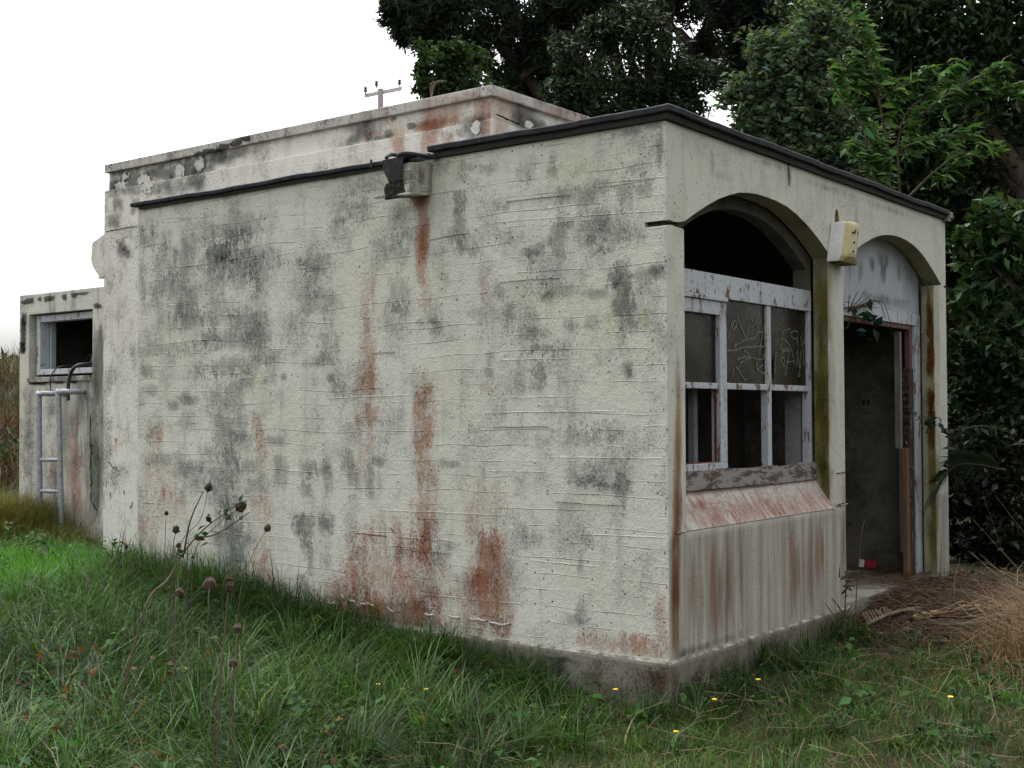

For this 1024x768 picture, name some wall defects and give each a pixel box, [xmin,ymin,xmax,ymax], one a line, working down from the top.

peeling [115,171,154,194]